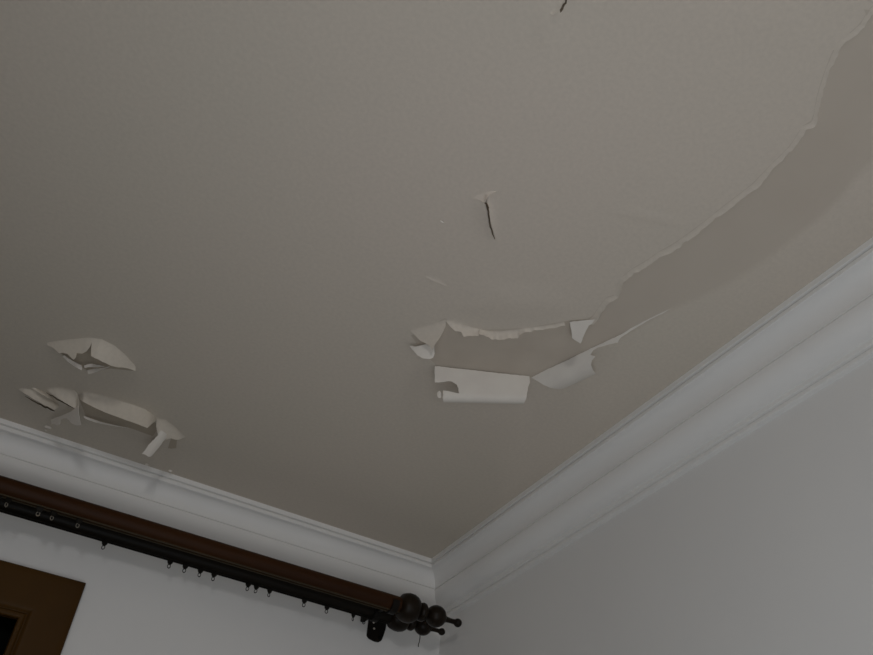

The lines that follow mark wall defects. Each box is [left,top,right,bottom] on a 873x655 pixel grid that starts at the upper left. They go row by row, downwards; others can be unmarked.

peeling [47,338,136,374]
peeling [409,308,668,404]
peeling [19,387,185,457]